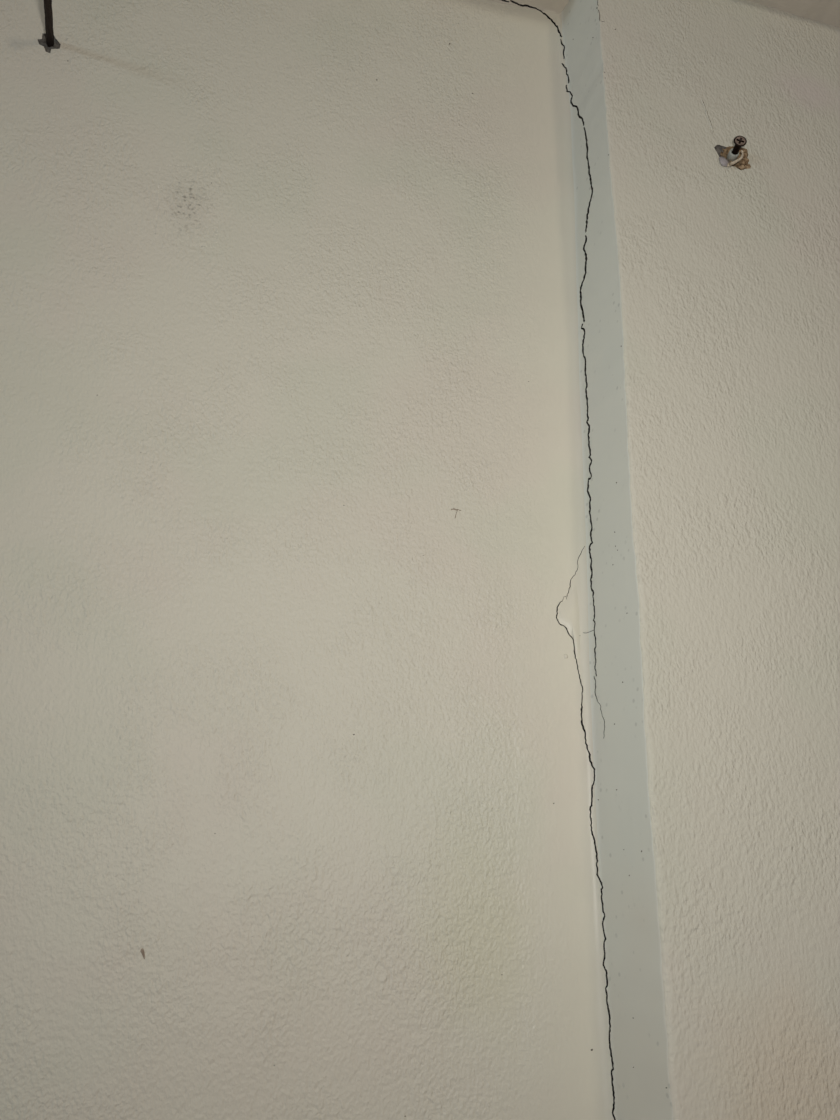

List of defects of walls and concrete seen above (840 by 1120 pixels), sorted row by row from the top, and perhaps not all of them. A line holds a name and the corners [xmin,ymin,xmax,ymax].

crack [501,0,616,1120]